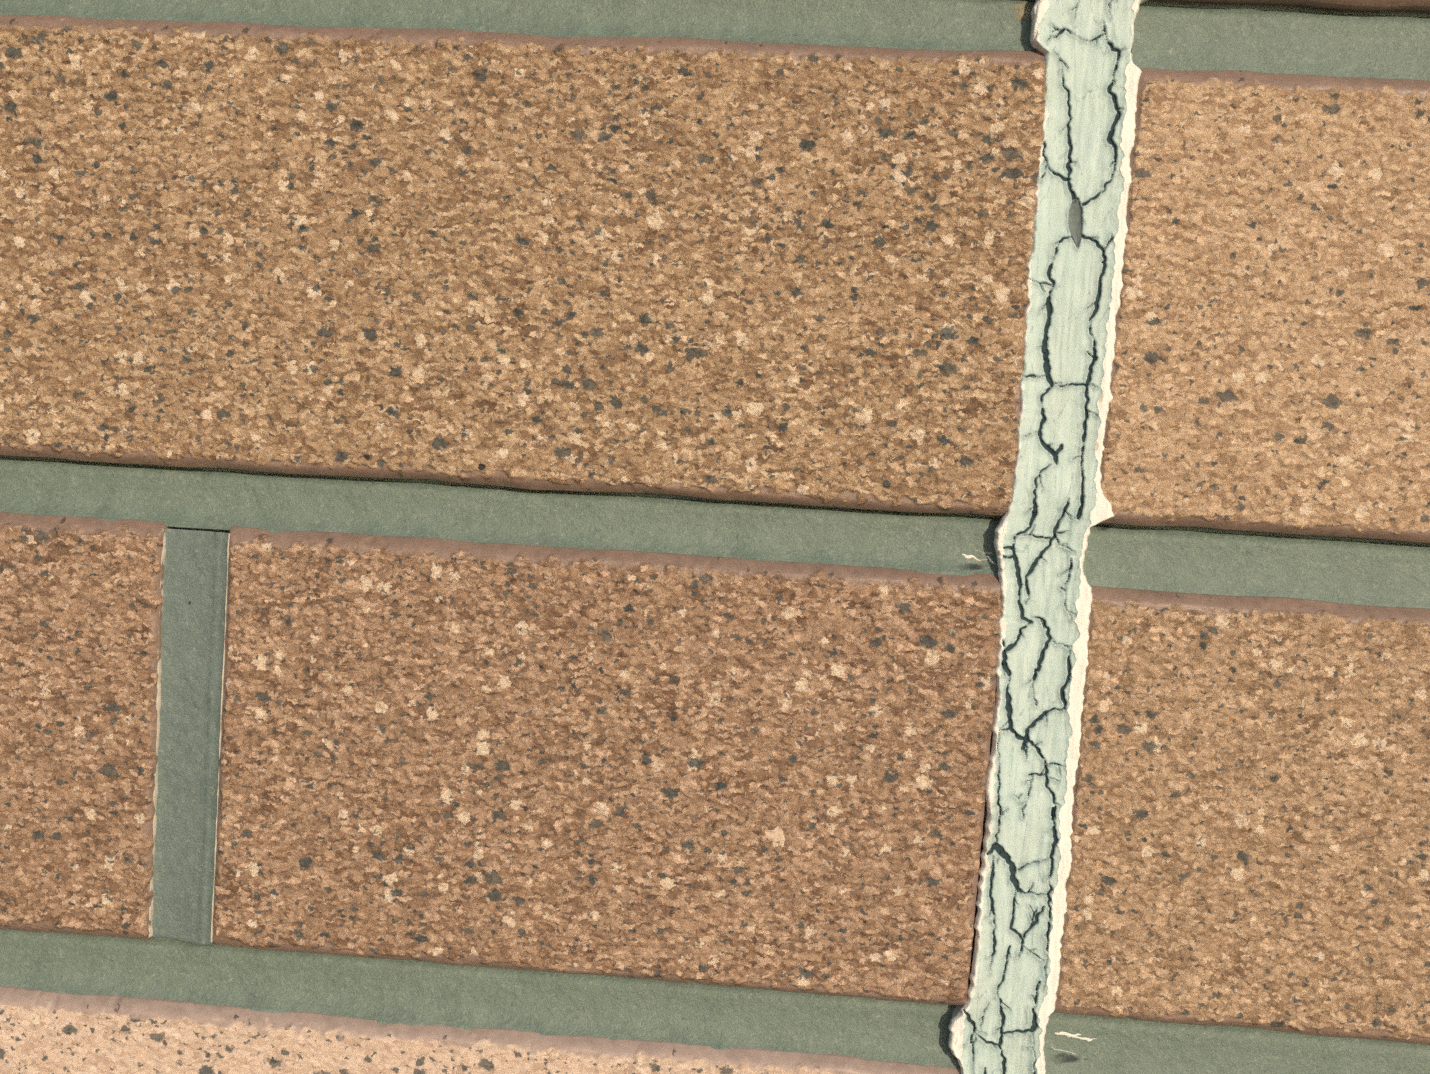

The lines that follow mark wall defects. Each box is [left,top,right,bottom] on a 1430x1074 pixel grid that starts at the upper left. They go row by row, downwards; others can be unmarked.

crack [963,4,1122,1074]